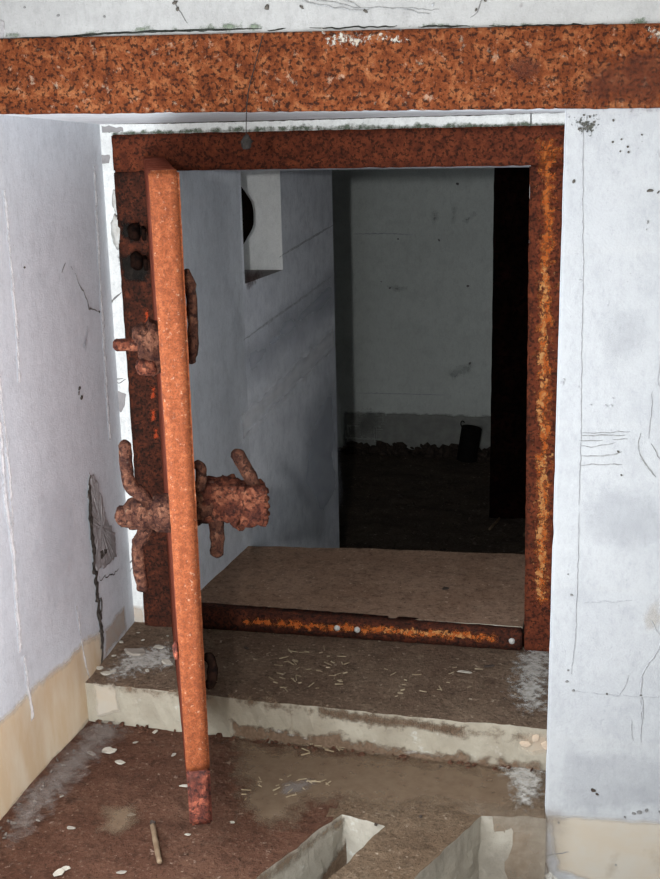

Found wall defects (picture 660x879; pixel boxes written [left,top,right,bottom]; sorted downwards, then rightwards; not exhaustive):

crack [299,0,434,14]
corrosion [532,139,562,605]
spalling [87,473,117,572]
crack [92,560,132,664]
corrosion [134,608,143,622]
corrosion [243,618,495,643]